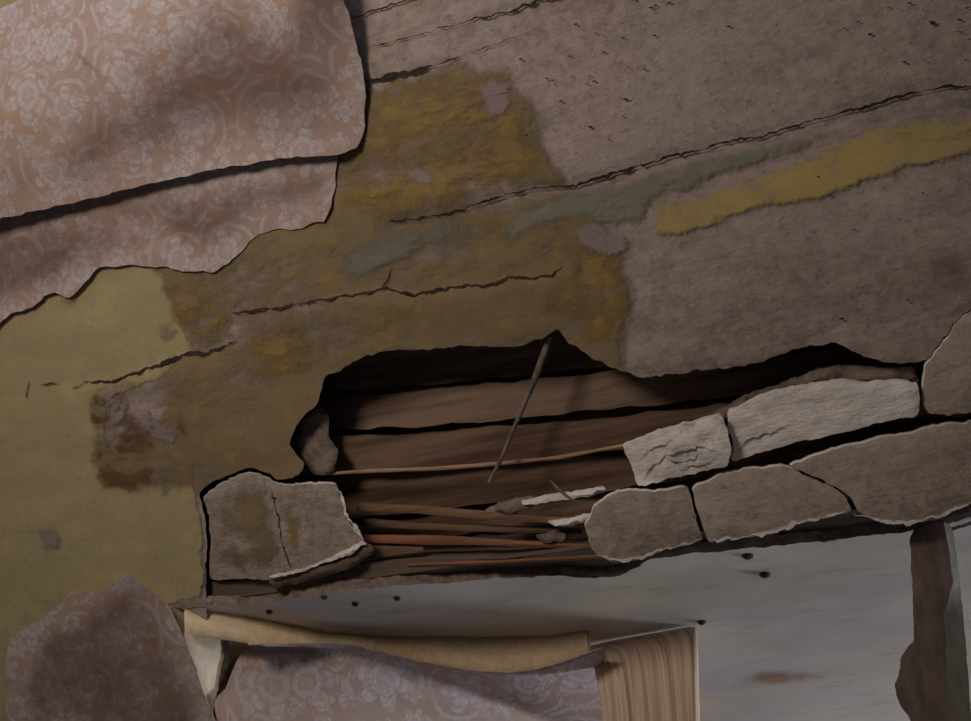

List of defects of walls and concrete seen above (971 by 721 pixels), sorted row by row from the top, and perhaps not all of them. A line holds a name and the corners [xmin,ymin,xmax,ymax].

crack [352,0,407,18]
crack [363,0,550,82]
crack [384,84,971,223]
peeling [655,119,971,235]
crack [232,266,563,314]
crack [26,341,236,395]
peeling [0,62,631,721]
crack [931,309,971,357]